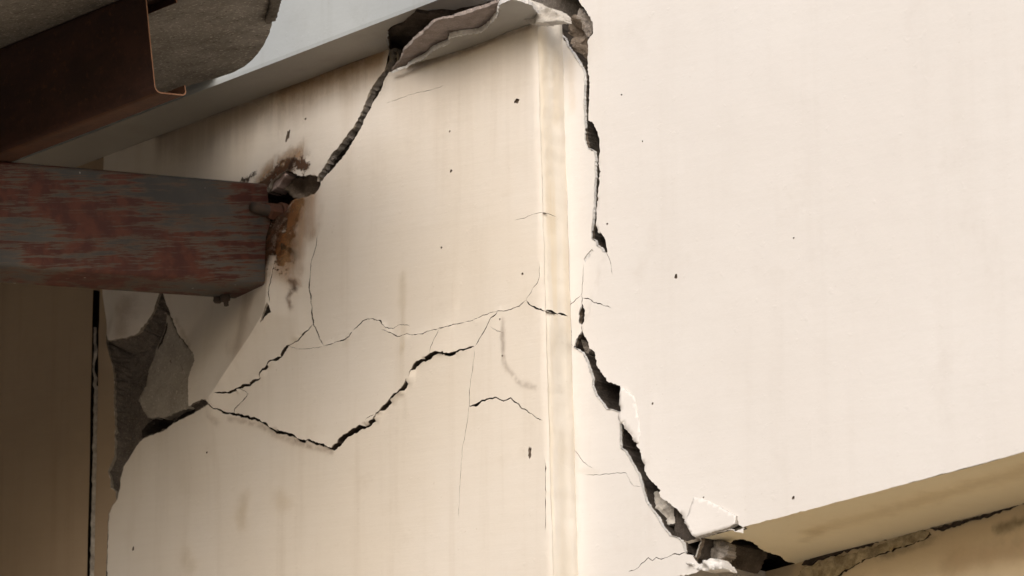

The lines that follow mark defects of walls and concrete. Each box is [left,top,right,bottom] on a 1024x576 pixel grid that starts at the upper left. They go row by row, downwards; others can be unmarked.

spalling [385,0,572,73]
rust [241,149,310,188]
spalling [267,169,324,205]
rust [265,197,306,276]
crack [142,24,767,574]
spalling [106,293,209,501]
spalling [674,508,737,573]